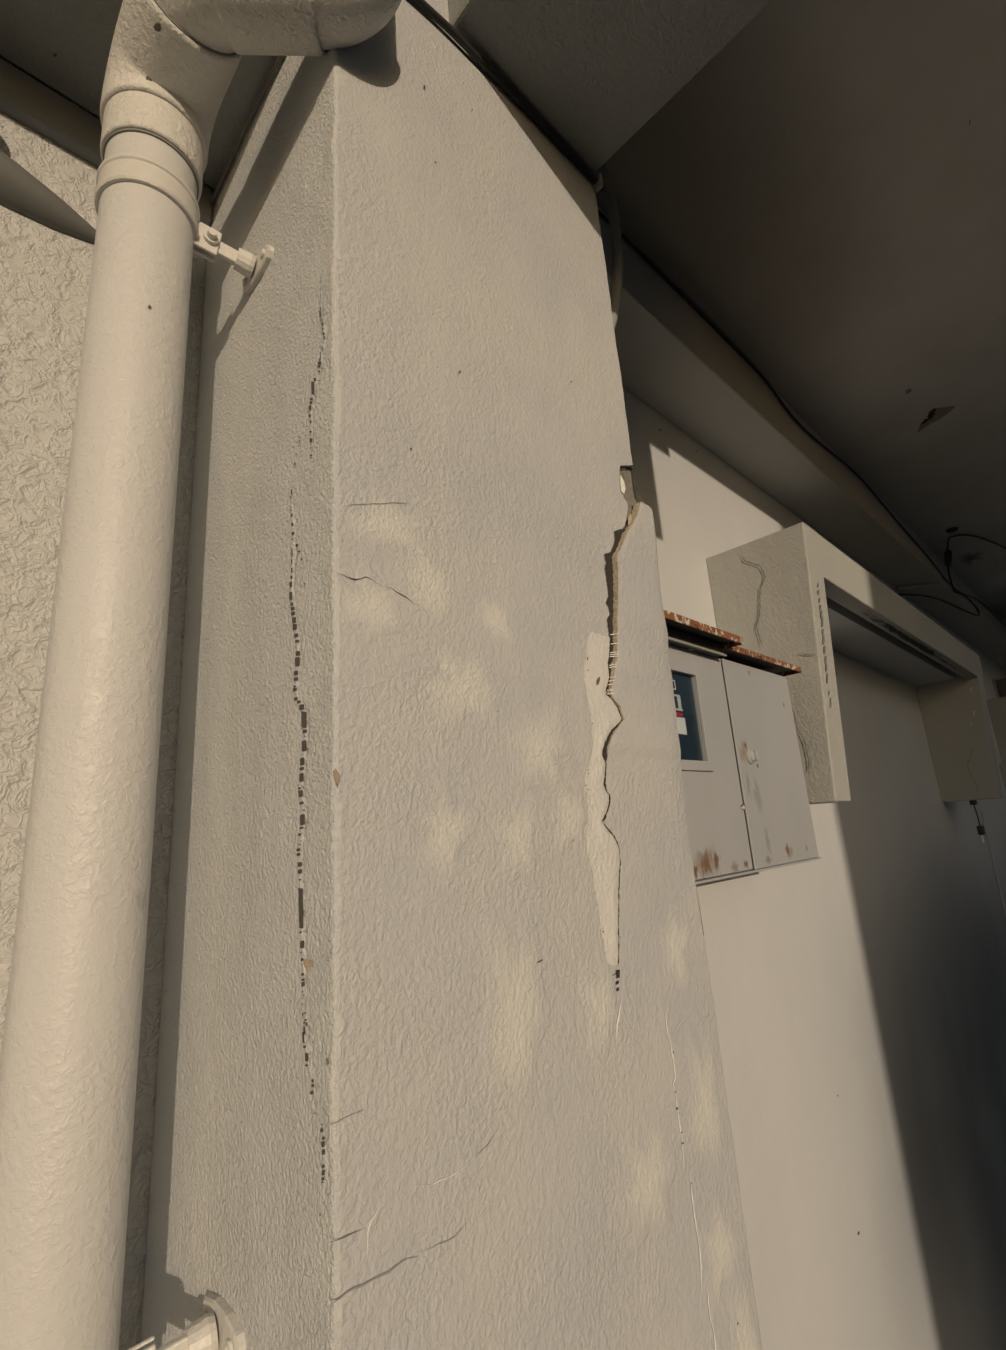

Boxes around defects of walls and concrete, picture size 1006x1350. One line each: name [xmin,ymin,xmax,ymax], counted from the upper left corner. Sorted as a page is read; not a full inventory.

crack [602,502,704,1042]